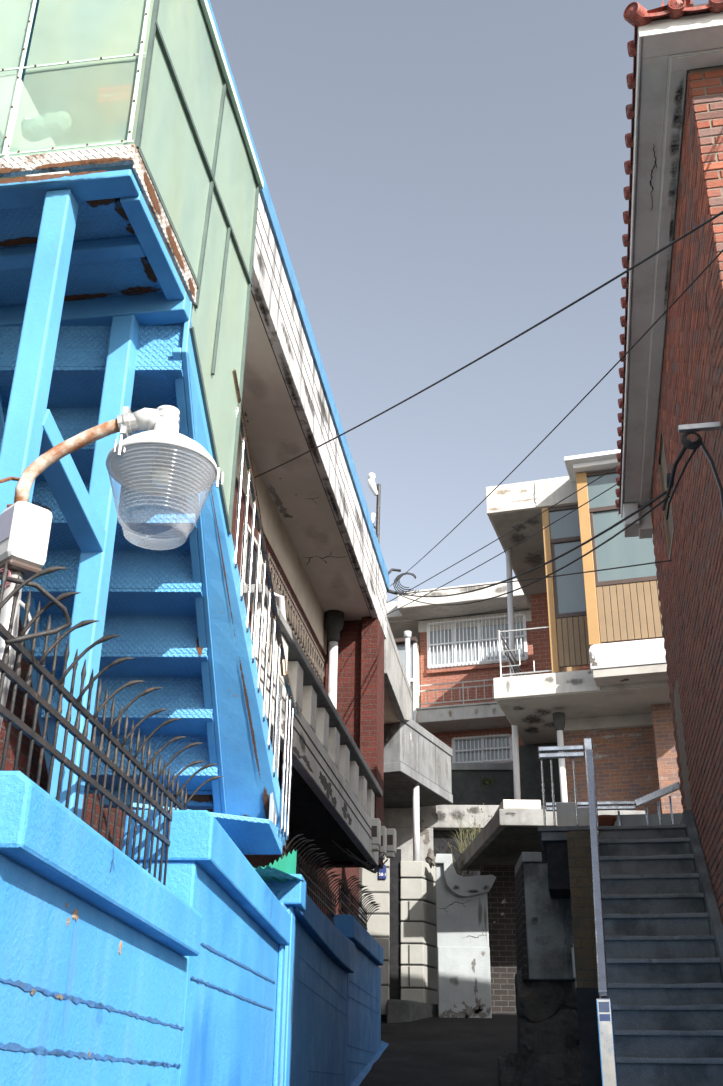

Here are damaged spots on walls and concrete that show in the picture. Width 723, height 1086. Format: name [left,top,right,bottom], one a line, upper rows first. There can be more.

corrosion [0,157,135,184]
crack [649,144,657,210]
damp [669,85,683,197]
corrosion [144,172,195,297]